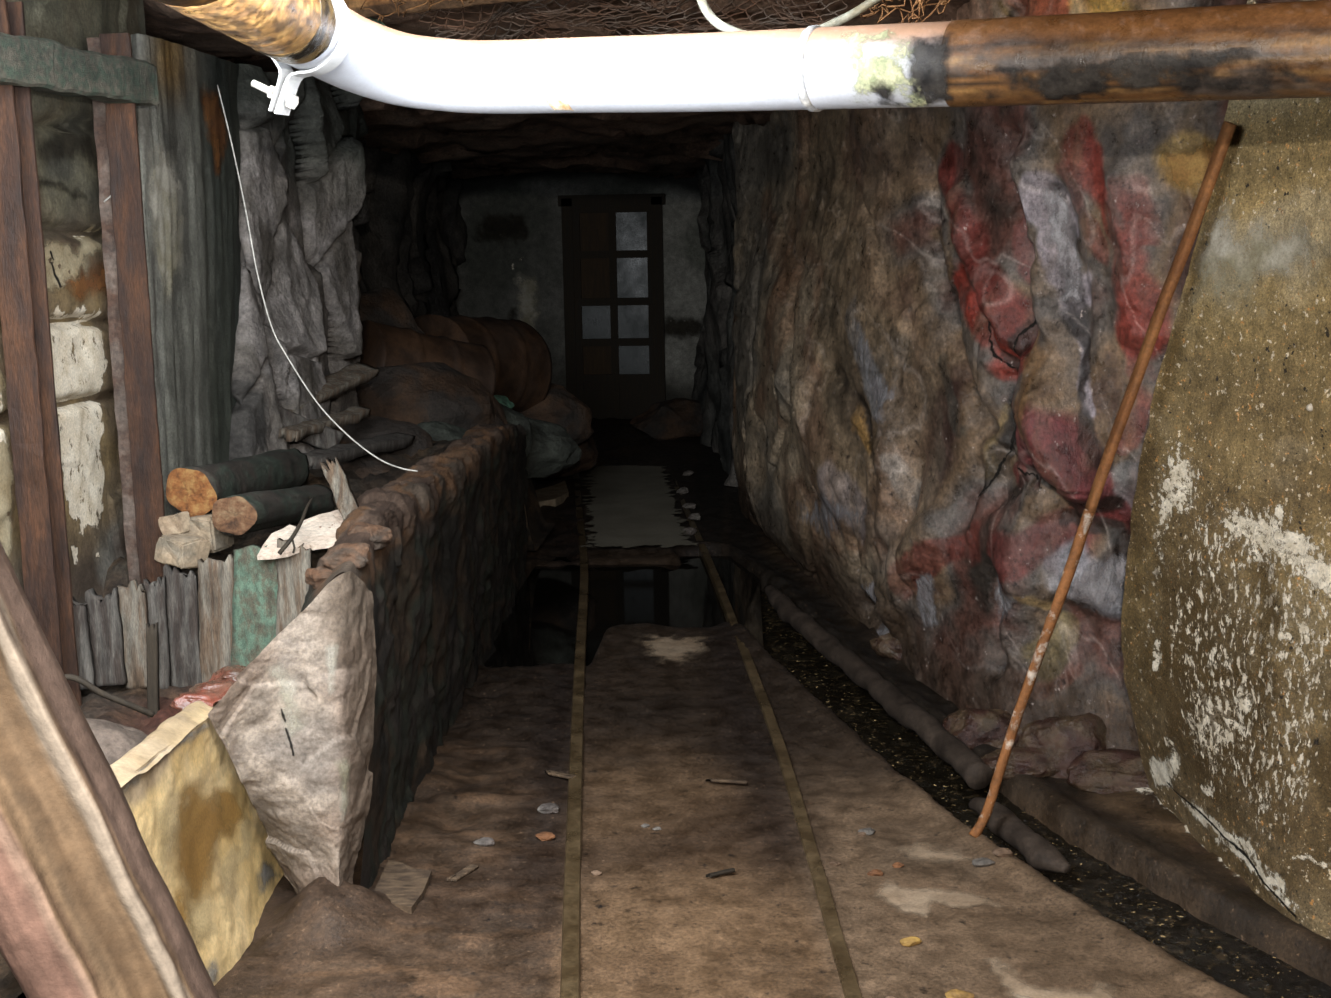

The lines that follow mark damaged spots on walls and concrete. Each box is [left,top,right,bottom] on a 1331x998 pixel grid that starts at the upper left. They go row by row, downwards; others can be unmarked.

damp [1069,555,1126,613]
damp [1134,441,1331,840]
crack [1167,782,1330,917]